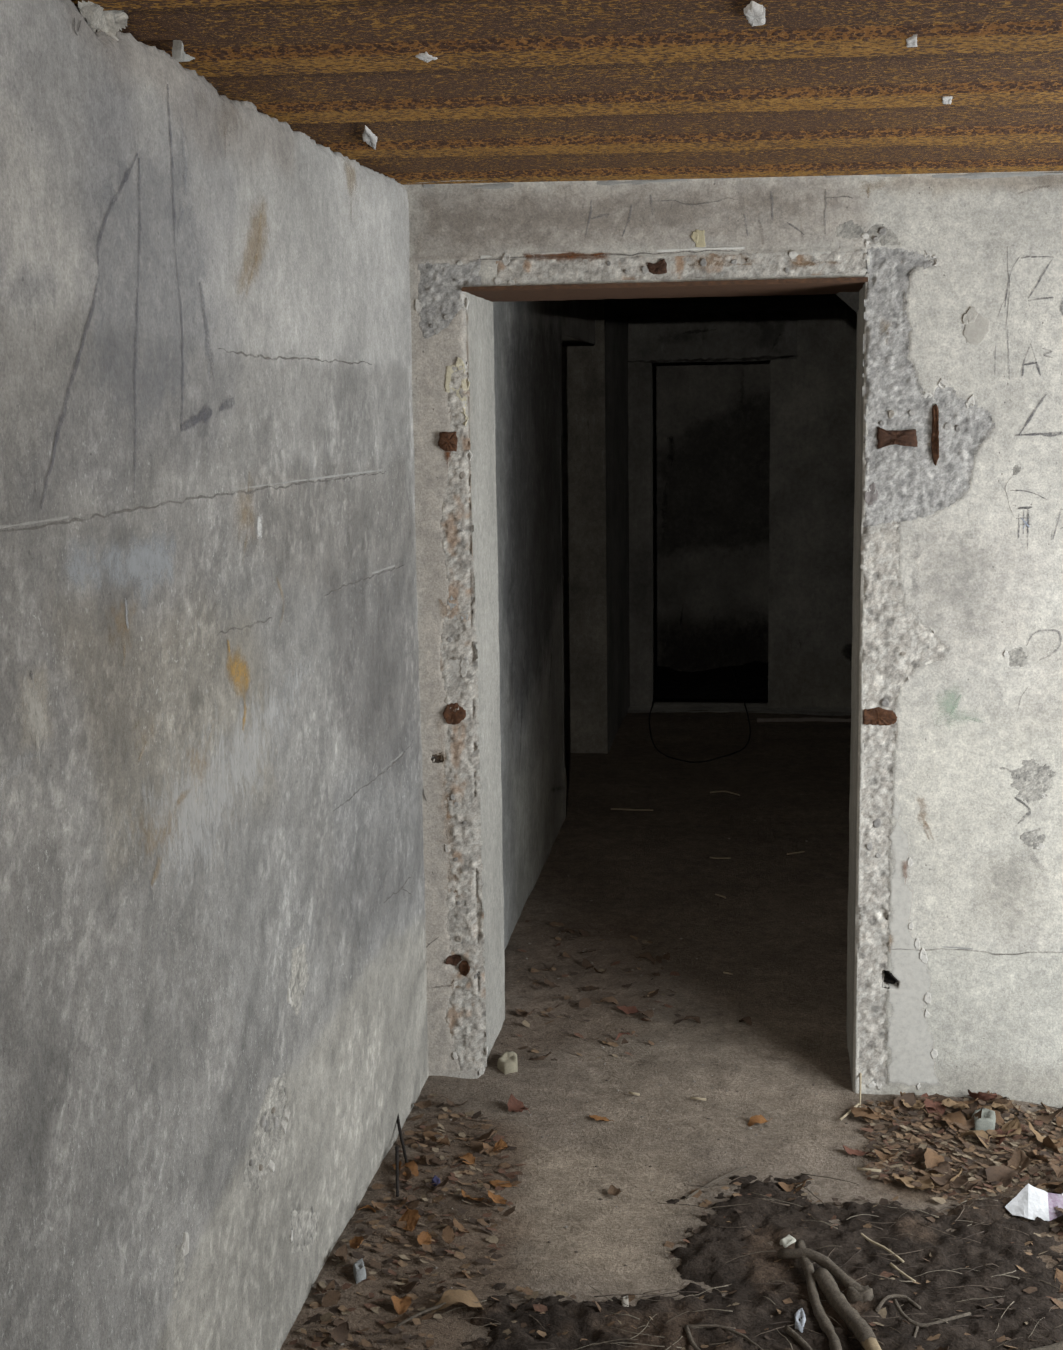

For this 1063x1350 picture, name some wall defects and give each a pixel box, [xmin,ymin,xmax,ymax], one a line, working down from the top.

rust [931,404,939,466]
crack [26,472,385,530]
spalling [415,220,995,1090]